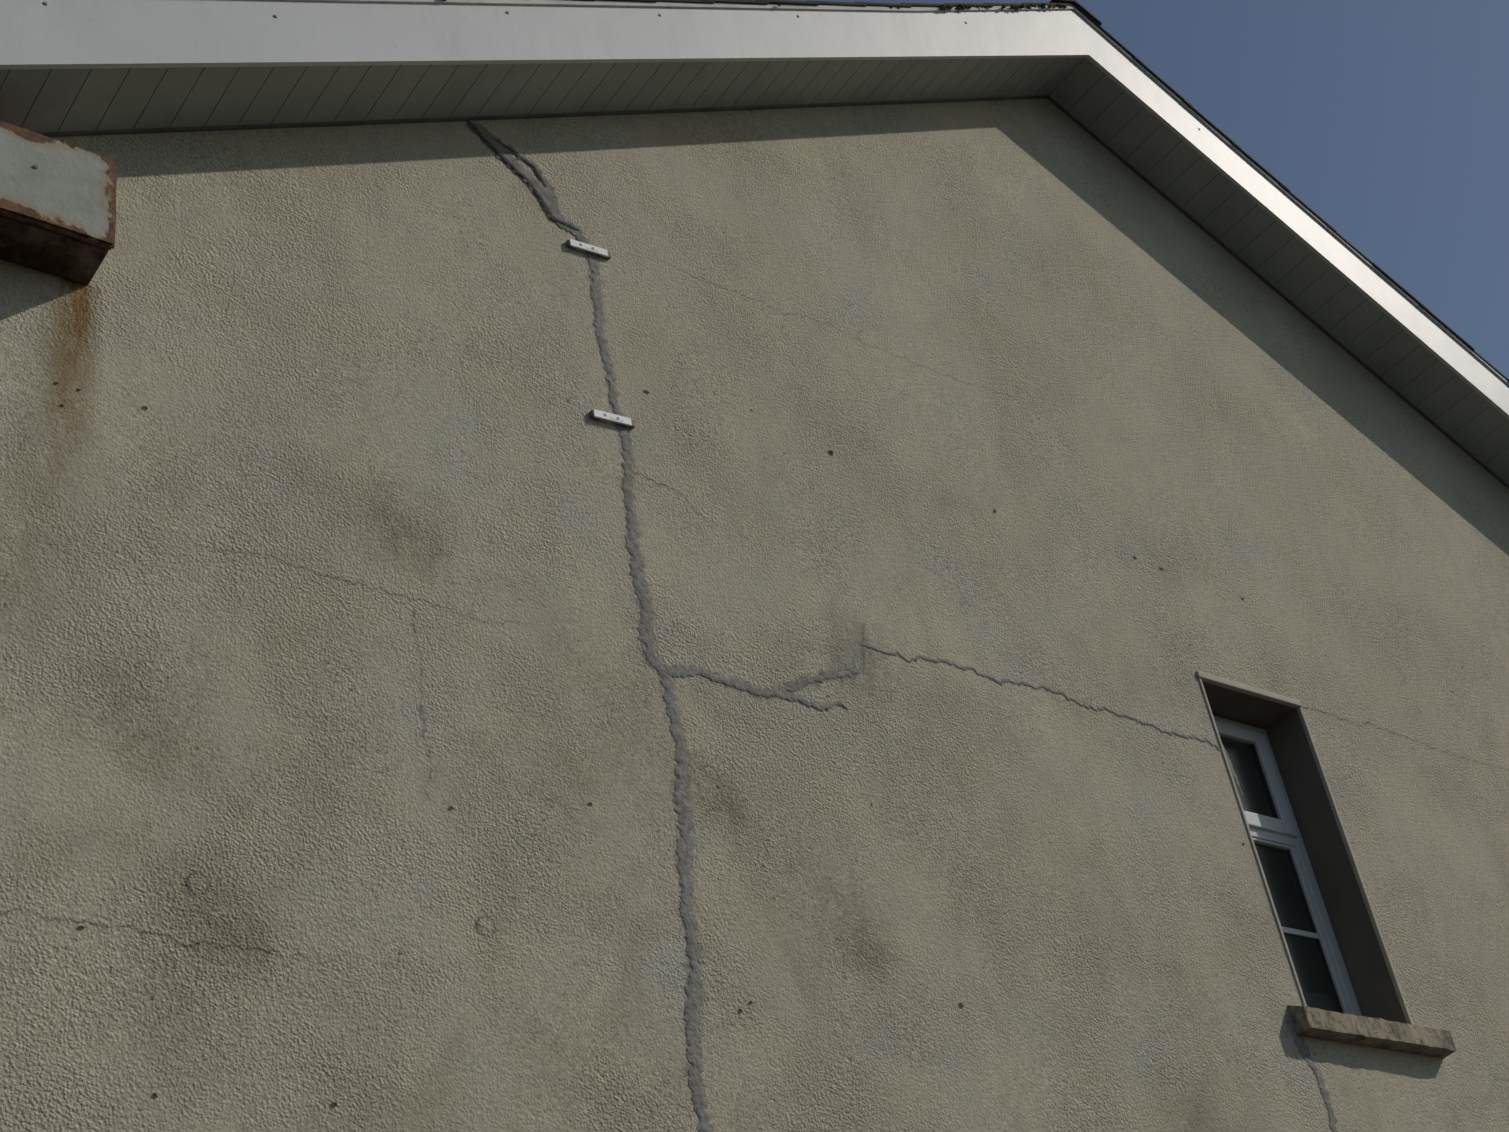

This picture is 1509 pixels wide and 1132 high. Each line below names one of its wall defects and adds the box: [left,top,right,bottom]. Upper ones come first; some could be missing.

crack [467,120,1244,1132]
crack [1294,1036,1337,1132]